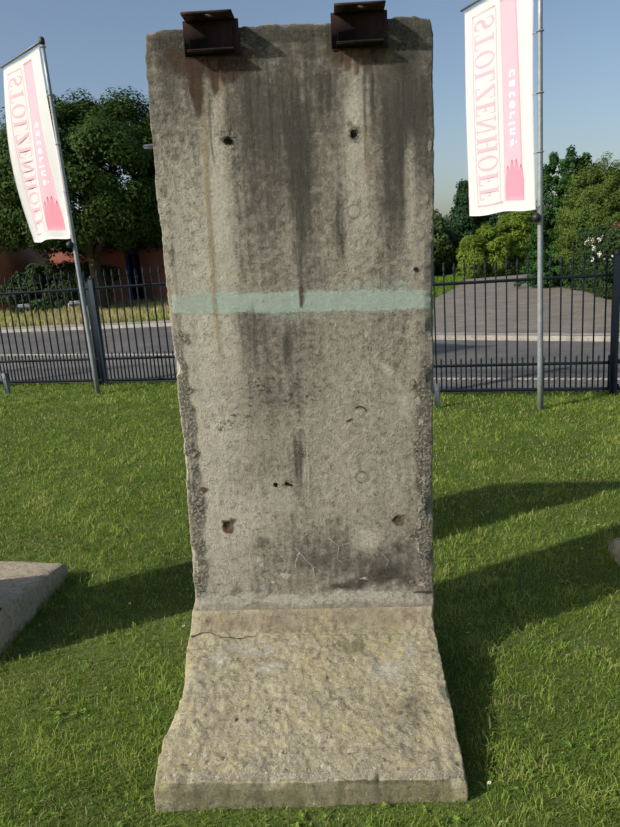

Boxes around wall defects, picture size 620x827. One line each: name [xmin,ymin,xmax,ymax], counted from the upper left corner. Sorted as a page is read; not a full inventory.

rust [167,45,253,115]
rust [327,42,396,72]
damp [346,92,366,164]
damp [206,96,231,258]
damp [202,589,423,607]
crack [191,631,253,639]